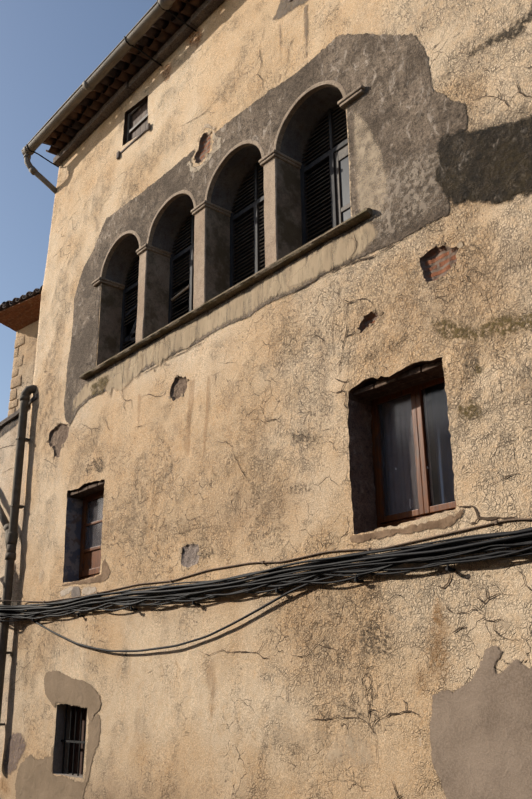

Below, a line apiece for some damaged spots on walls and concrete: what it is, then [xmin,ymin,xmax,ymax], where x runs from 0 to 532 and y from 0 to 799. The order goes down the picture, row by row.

crack [470,66,532,115]
spalling [187,124,221,173]
leakage [73,114,532,408]
spalling [416,241,463,285]
crack [274,227,421,424]
spalling [356,309,383,334]
spalling [168,375,189,401]
spalling [46,423,70,459]
crack [458,505,530,524]
crack [438,571,532,640]
crack [200,640,268,659]
crack [309,665,422,765]